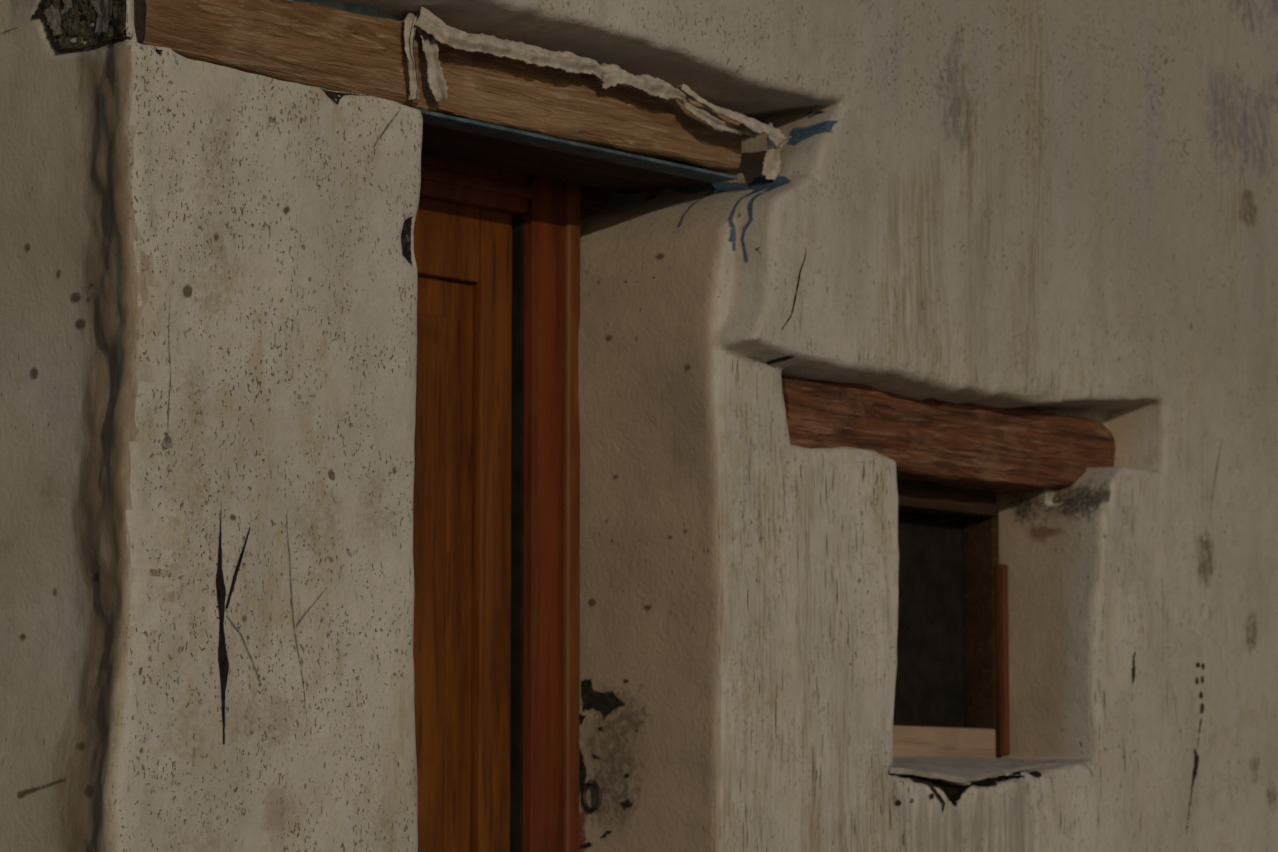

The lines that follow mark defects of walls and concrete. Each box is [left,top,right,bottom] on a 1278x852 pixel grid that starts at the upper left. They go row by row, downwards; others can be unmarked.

flaking render [32,0,133,53]